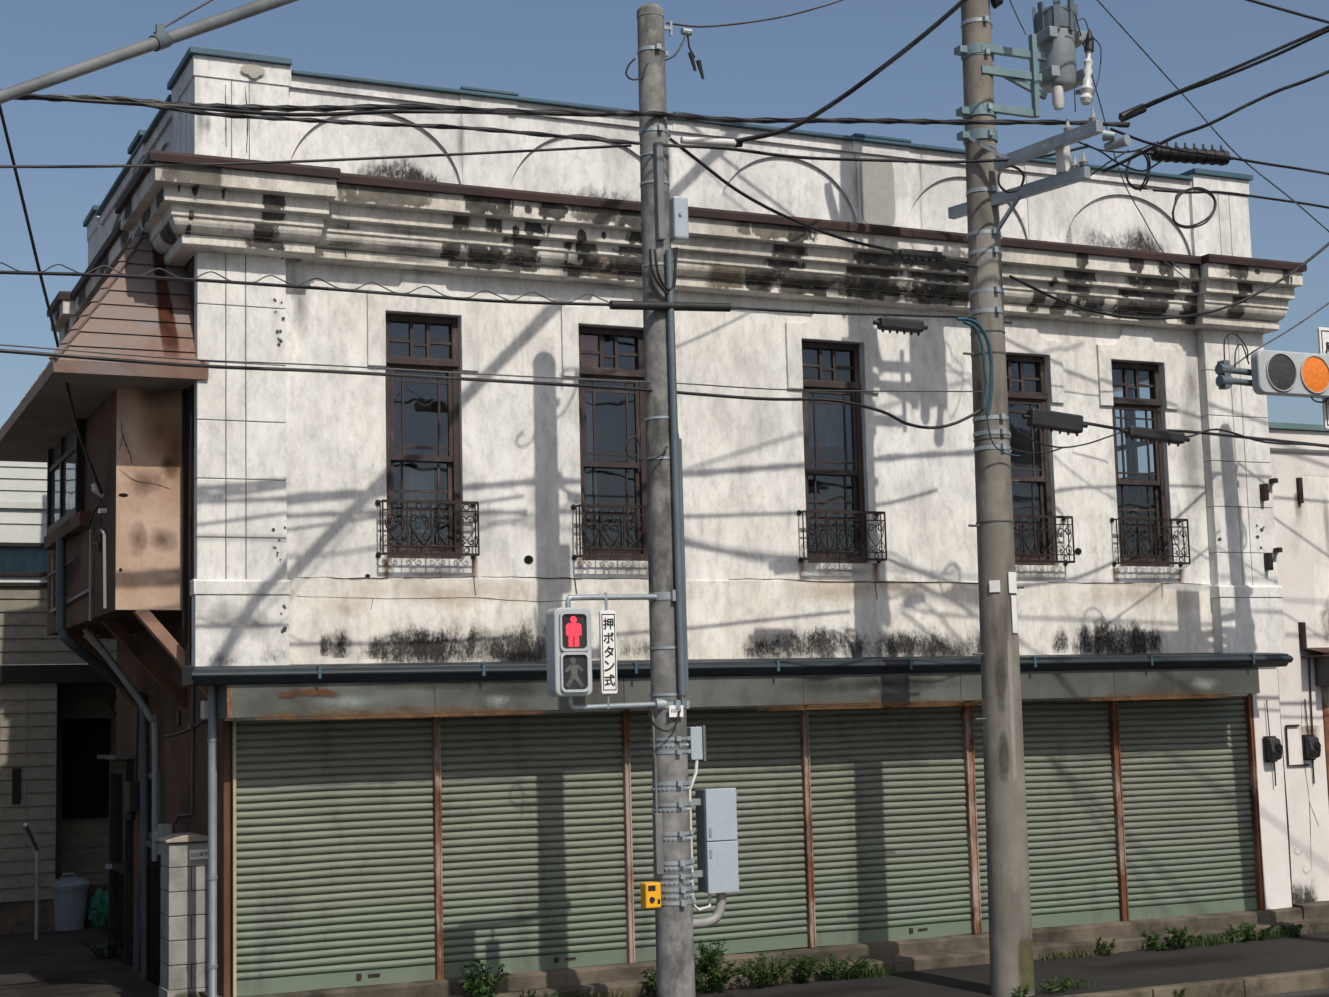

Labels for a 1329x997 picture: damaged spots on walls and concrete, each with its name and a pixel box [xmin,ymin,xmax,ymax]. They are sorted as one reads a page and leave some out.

peeling [440,196,642,285]
peeling [710,221,970,307]
peeling [1026,254,1201,325]
peeling [1226,265,1260,319]
leakage [368,627,547,662]
leakage [747,630,980,658]
leakage [1053,622,1160,654]
rust [318,709,503,720]